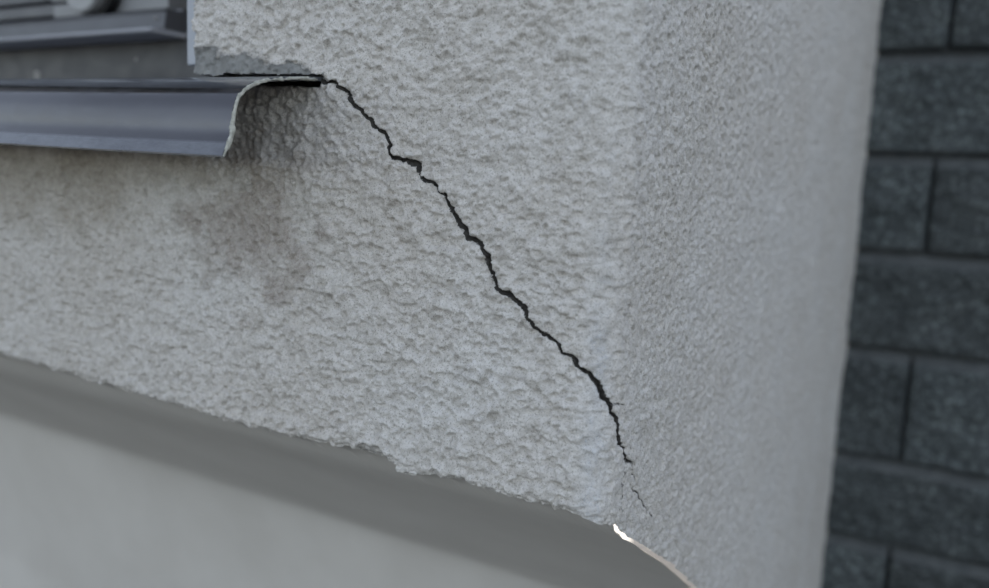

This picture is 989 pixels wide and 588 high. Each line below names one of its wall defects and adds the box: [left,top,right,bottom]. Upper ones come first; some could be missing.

crack [317,74,652,516]